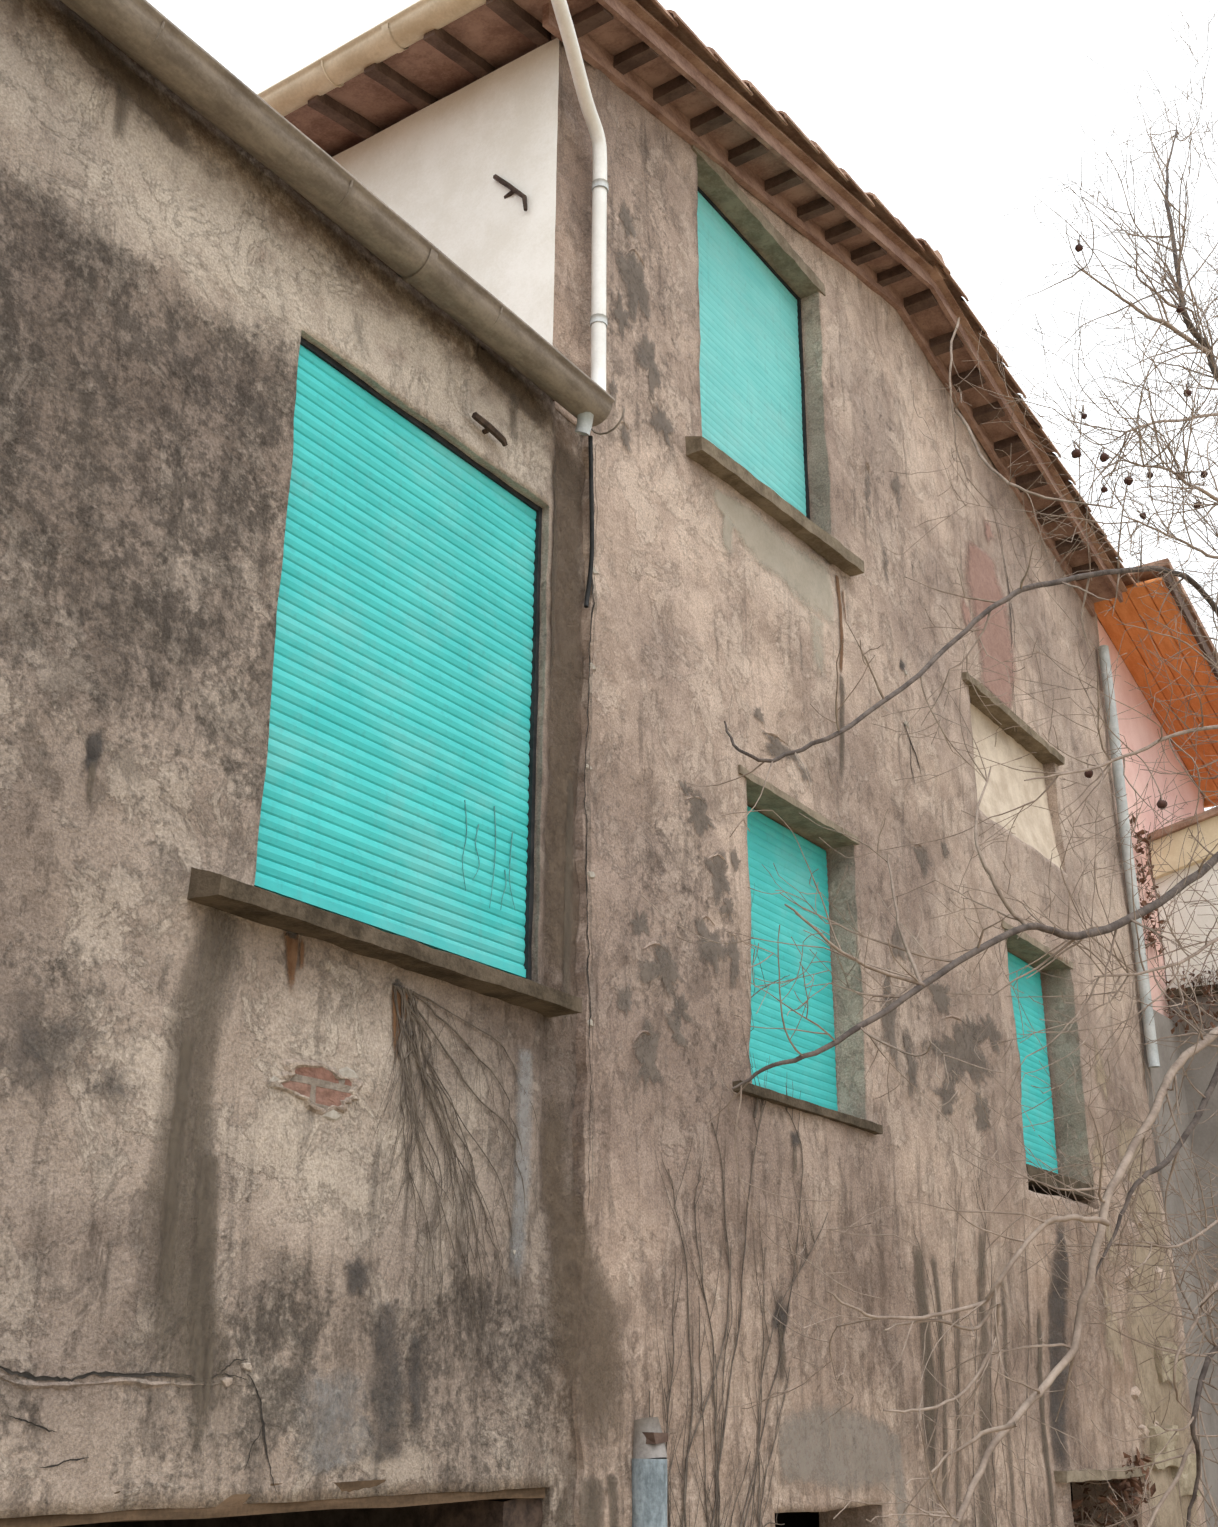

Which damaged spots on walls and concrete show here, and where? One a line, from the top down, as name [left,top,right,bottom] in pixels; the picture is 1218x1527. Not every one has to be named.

flaking render [263,1059,363,1121]
leakage [156,908,233,1410]
leakage [348,1261,367,1293]
crack [0,1359,277,1492]
leakage [377,1305,420,1454]